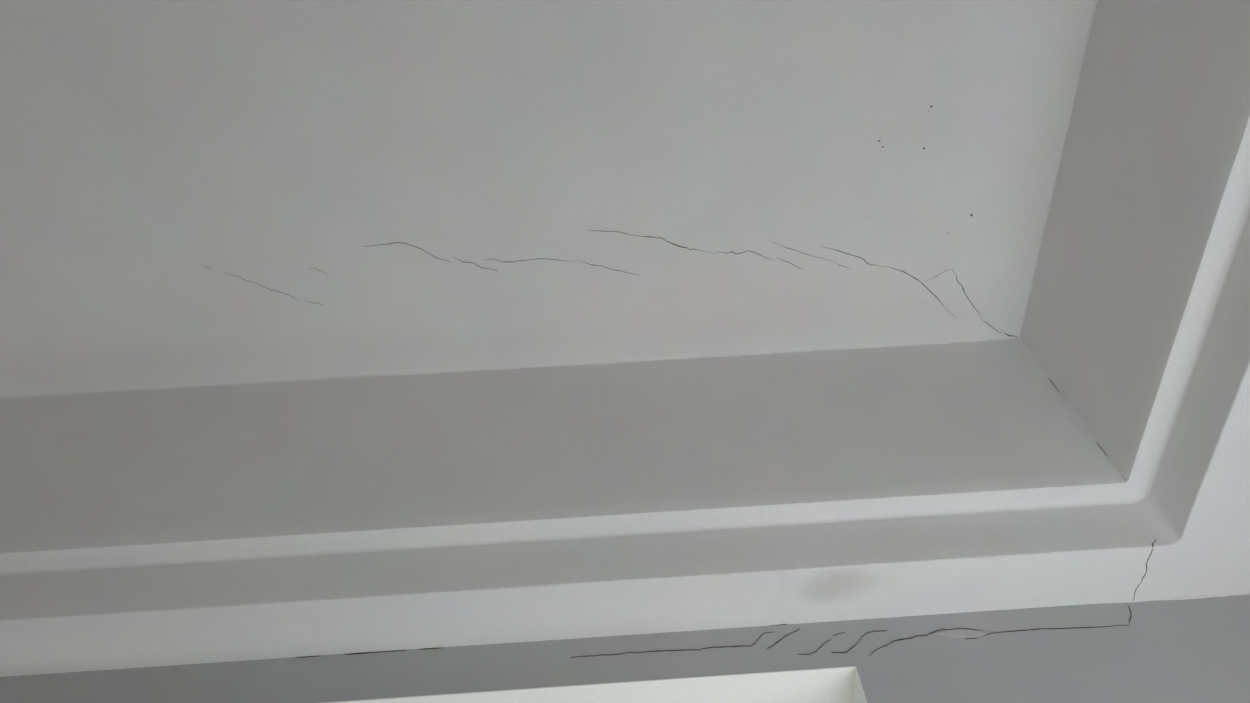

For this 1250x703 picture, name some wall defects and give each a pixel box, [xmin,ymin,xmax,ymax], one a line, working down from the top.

crack [363,242,640,276]
crack [590,230,1018,338]
crack [571,539,1157,658]
crack [295,648,439,658]